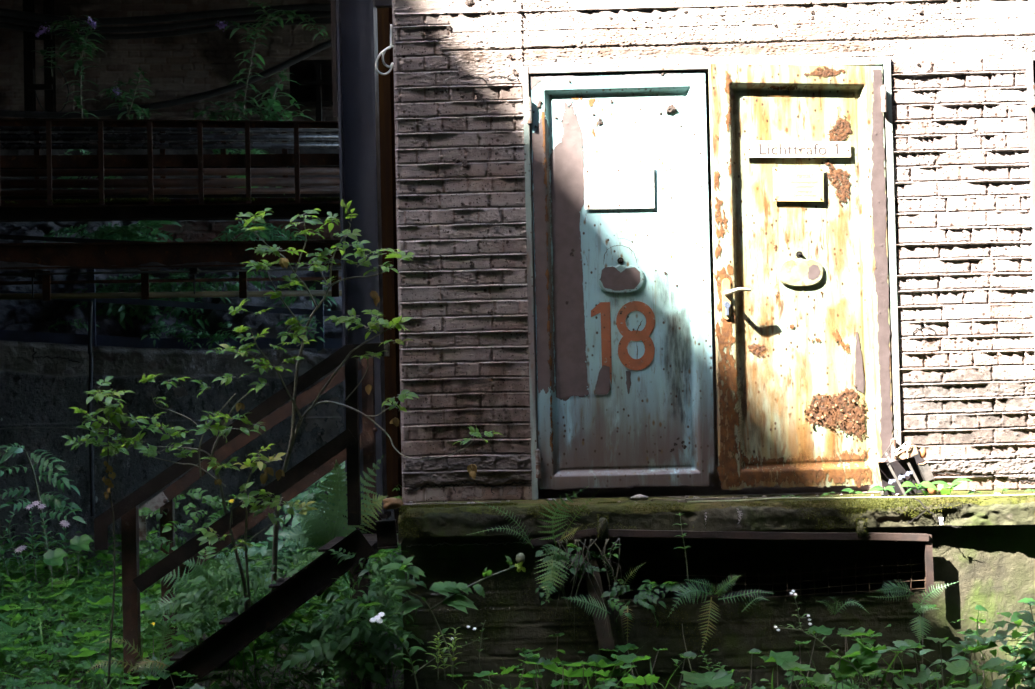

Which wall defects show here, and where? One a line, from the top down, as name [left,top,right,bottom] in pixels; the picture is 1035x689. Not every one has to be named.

corrosion [804,66,845,77]
peeling [531,101,611,401]
corrosion [711,71,872,488]